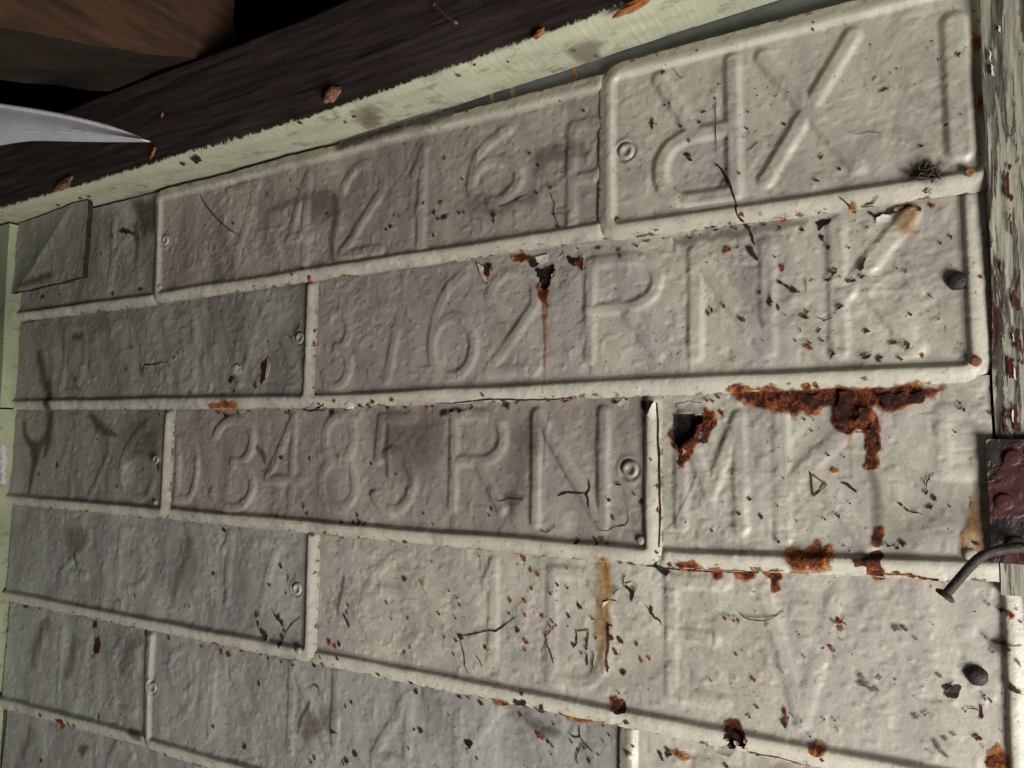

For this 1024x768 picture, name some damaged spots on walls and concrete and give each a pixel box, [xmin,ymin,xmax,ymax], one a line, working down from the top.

peeling [999,163,1014,235]
peeling [478,263,492,285]
peeling [1012,269,1021,311]
corrosion [537,283,550,370]
peeling [1008,328,1024,381]
corrosion [669,381,946,470]
peeling [988,403,1020,435]
peeling [899,473,937,515]
corrosion [853,526,940,581]
corrosion [572,540,835,673]
corrosion [809,735,827,762]
corrosion [987,744,1011,768]